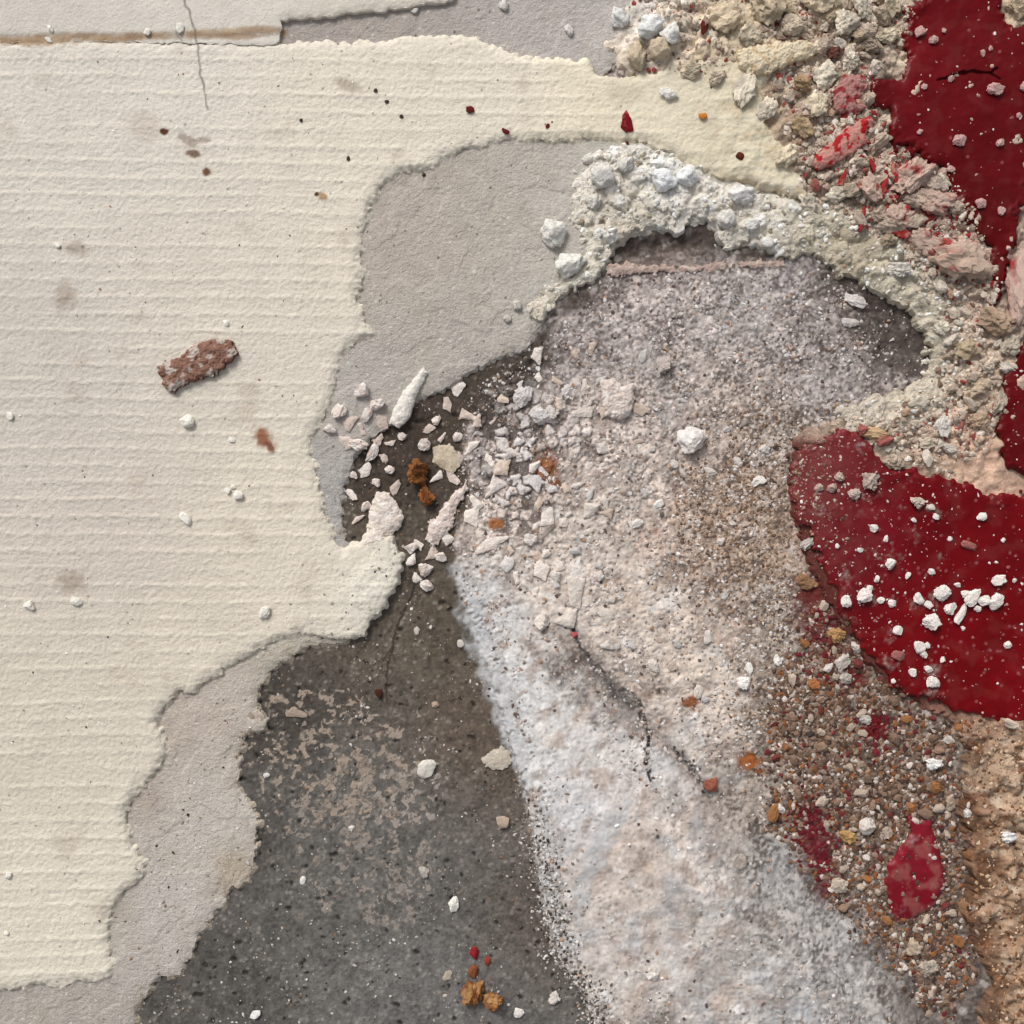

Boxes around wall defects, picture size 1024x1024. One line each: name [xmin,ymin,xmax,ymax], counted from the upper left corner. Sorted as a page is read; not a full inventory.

peeling [705,172,780,197]
peeling [689,215,774,255]
spalling [738,0,1024,497]
peeling [311,110,686,548]
crack [559,613,712,798]
spalling [417,759,436,778]
spalling [481,745,512,770]
spalling [790,501,1024,1024]
peeling [0,633,351,1024]
spalling [496,816,509,829]
spalling [448,896,459,912]
peeling [469,947,490,966]